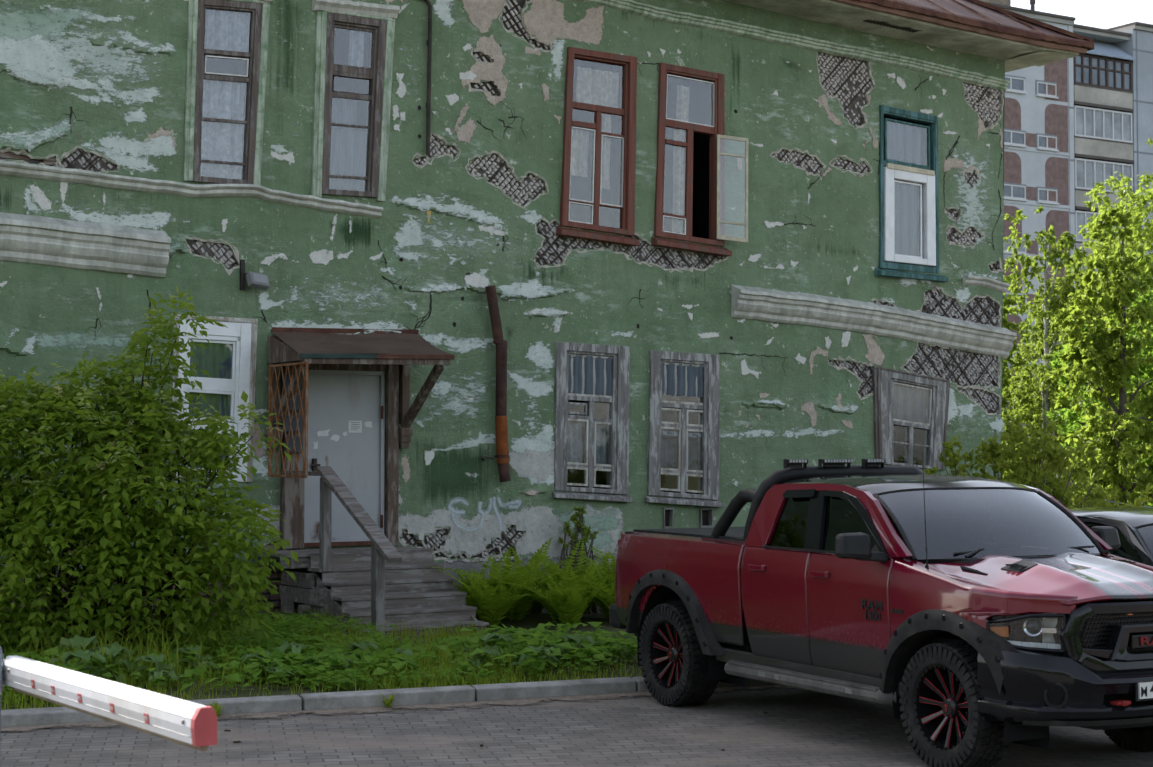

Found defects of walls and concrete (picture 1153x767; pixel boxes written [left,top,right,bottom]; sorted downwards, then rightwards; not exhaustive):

flaking render [748,52,878,180]
peeling [887,73,906,89]
peeling [22,182,190,232]
flaking render [169,219,240,276]
flaking render [258,0,798,561]
flaking render [870,257,1004,327]
peeling [942,82,1004,253]
flaking render [900,342,1006,434]